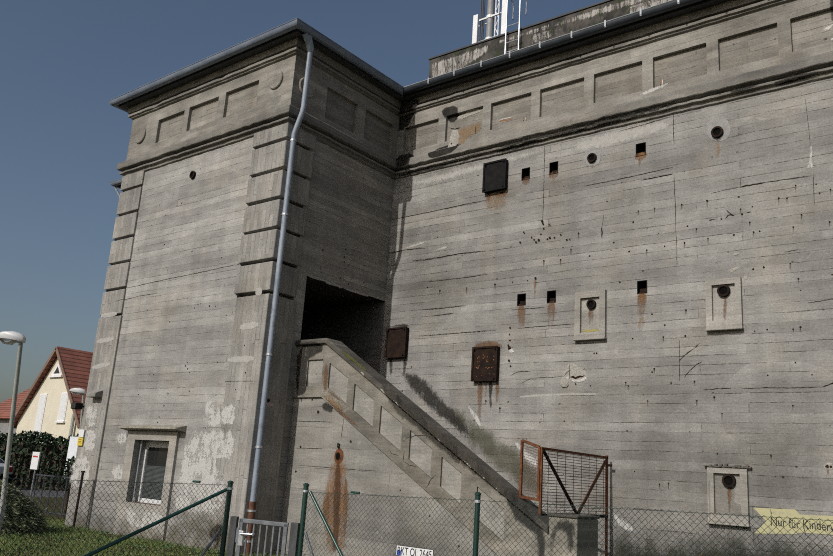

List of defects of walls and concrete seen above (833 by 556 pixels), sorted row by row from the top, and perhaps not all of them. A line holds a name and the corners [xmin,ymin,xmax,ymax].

spalling [448,108,483,148]
damp [296,342,323,402]
corrosion [478,381,499,407]
spalling [560,363,587,388]
peeling [175,401,235,515]
corrosion [323,463,348,550]